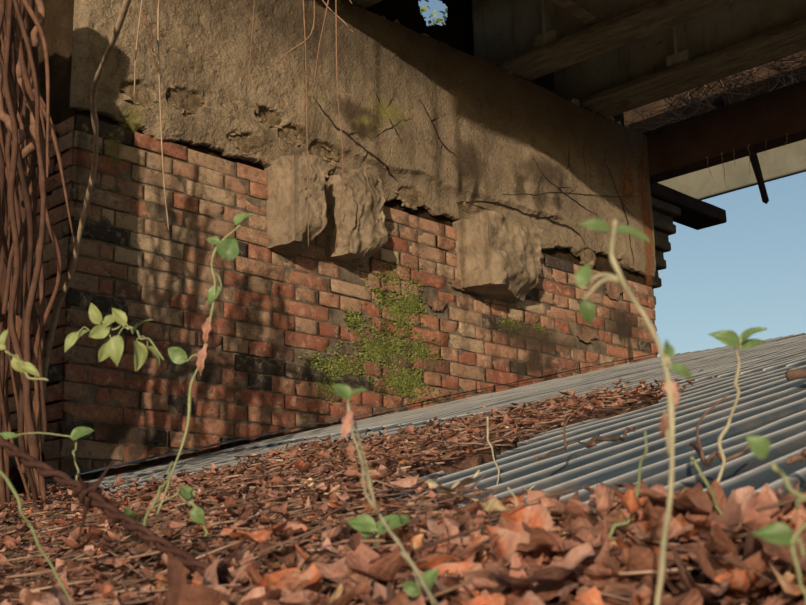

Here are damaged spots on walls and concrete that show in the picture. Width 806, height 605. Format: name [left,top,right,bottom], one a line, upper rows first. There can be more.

spalling [120,79,205,115]
spalling [230,130,263,156]
spalling [253,103,342,180]
spalling [394,186,424,210]
water stain [298,320,455,405]